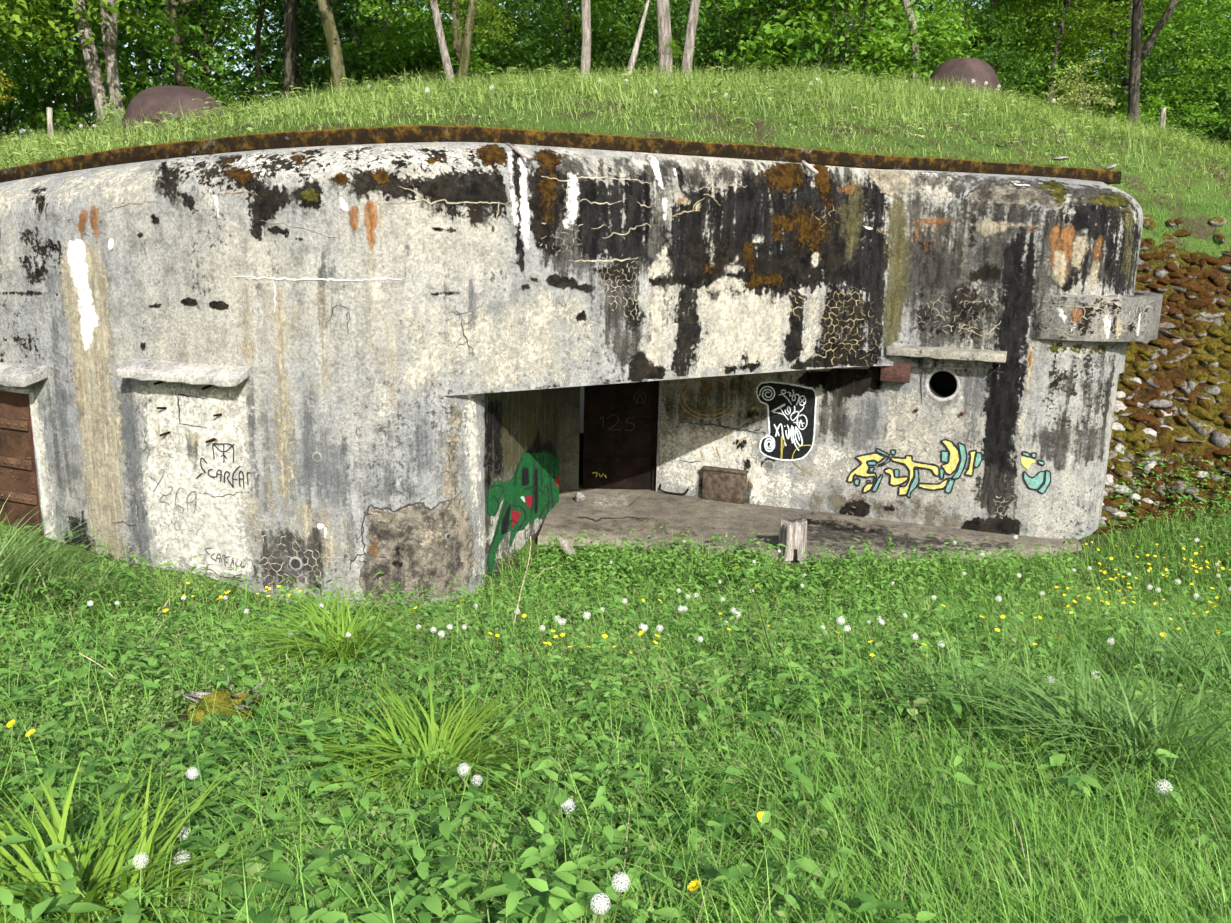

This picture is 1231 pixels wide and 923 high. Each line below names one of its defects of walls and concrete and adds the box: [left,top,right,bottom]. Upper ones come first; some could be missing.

corrosion [77,206,99,238]
corrosion [349,201,378,263]
crack [380,186,514,227]
crack [540,176,748,320]
corrosion [915,218,948,251]
corrosion [1050,225,1102,289]
crack [234,276,402,331]
crack [787,287,880,365]
damp [0,144,1155,595]
spalling [359,394,487,605]
spalling [289,557,303,571]